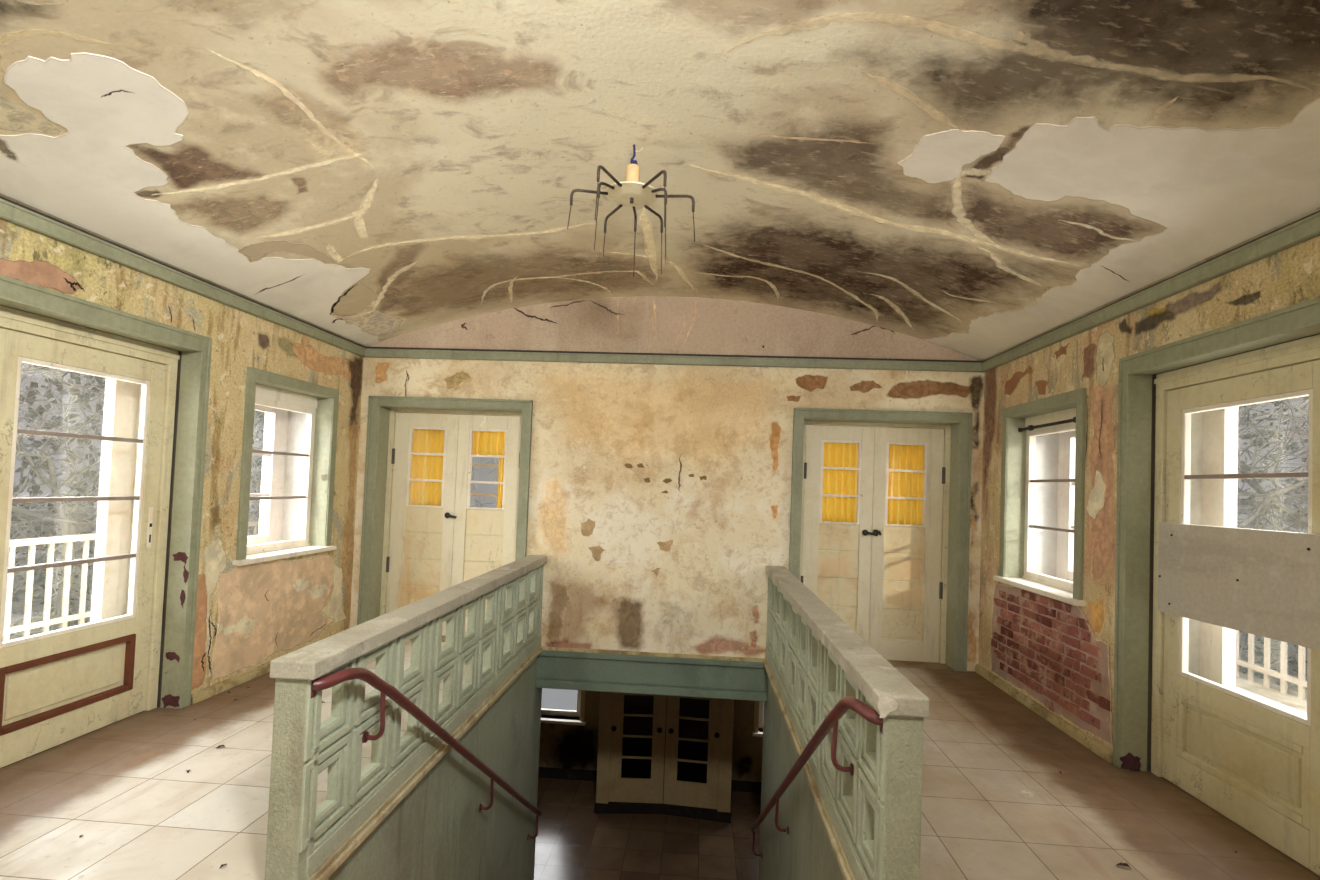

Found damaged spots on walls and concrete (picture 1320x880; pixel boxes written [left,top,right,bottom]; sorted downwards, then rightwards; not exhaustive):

water stain [0,0,35,13]
water stain [404,54,512,97]
water stain [927,0,1320,112]
peeling [0,52,380,346]
water stain [397,254,656,310]
water stain [702,226,1020,324]
water stain [738,127,1140,257]
peeling [898,97,1320,360]
peeling [787,375,828,401]
peeling [850,380,971,399]
peeling [162,536,346,708]
flaking render [990,582,1141,772]